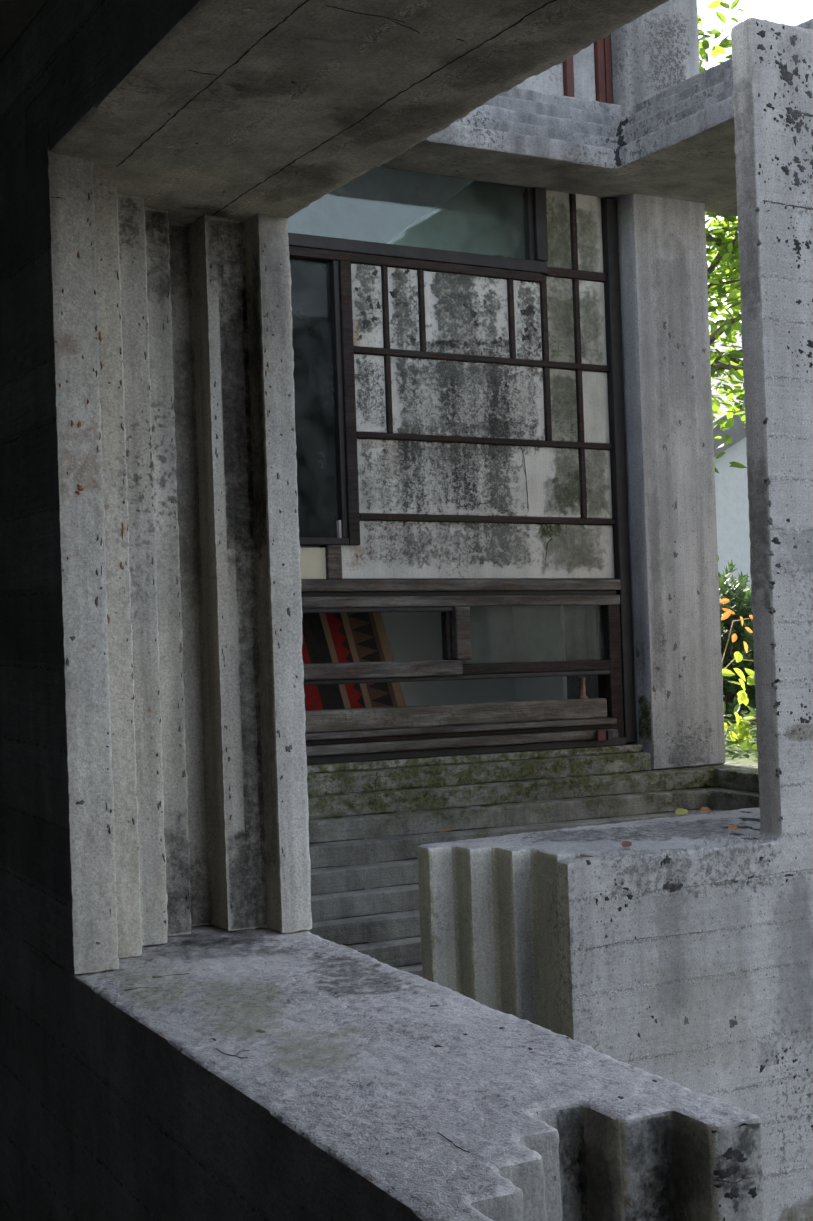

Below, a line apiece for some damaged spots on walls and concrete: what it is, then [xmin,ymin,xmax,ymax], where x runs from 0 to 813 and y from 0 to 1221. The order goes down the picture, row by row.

crack [116,0,420,167]
crack [213,0,557,216]
damp [355,271,546,569]
damp [145,208,415,999]
damp [713,1123,763,1221]